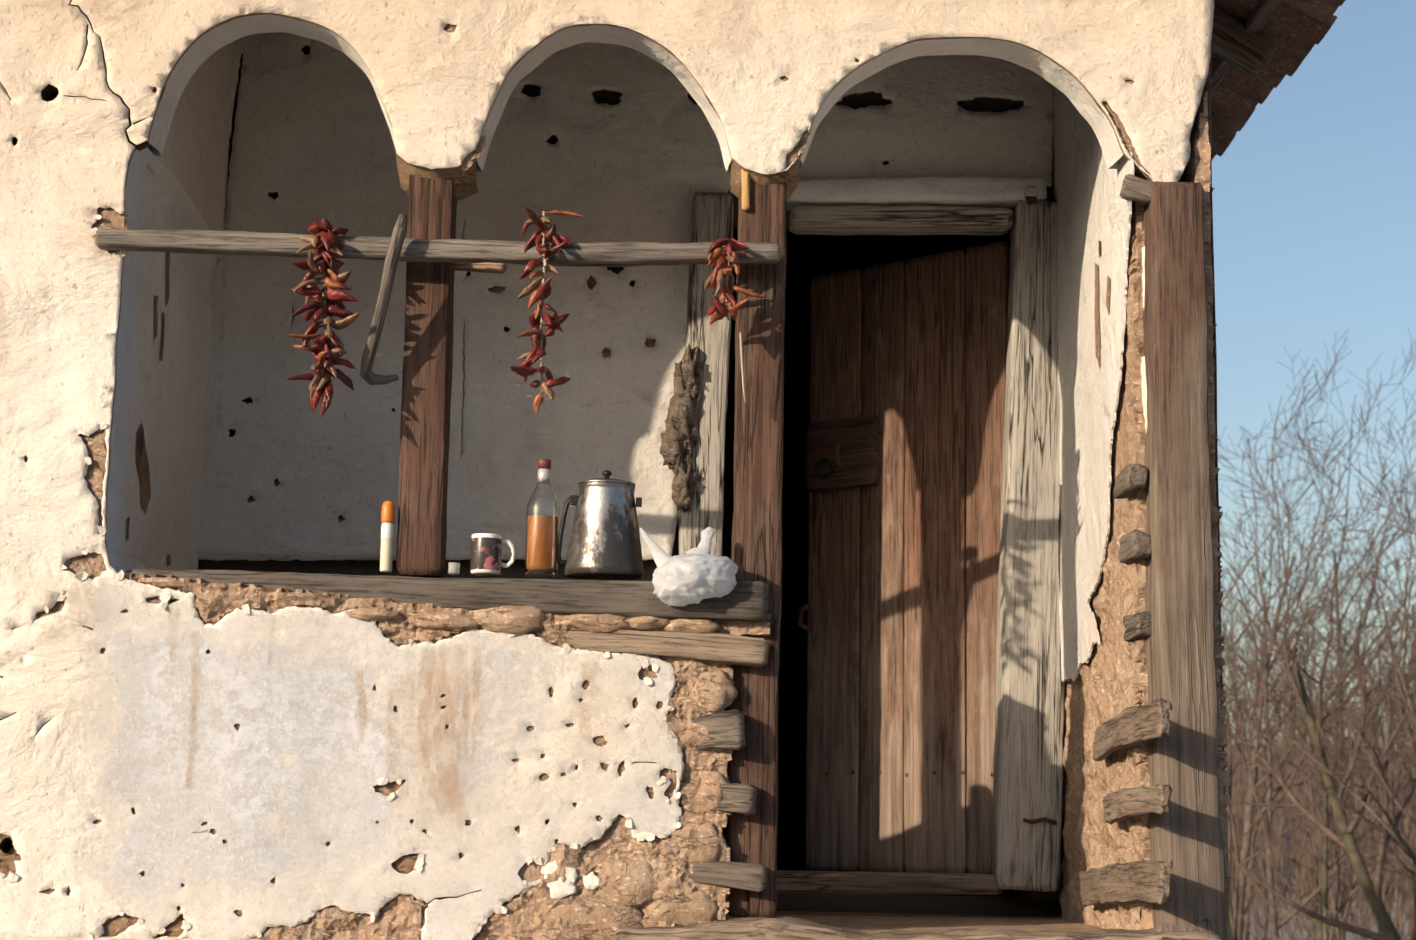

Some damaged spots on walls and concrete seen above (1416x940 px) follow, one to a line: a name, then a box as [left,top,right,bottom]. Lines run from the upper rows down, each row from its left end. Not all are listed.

crack [64,0,150,152]
flaking render [1140,356,1148,436]
flaking render [79,423,111,536]
flaking render [62,551,125,581]
flaking render [625,657,659,728]
flaking render [593,736,626,777]
flaking render [374,777,406,801]
flaking render [645,768,681,803]
flaking render [0,834,21,882]
flaking render [392,852,424,874]
flaking render [518,839,600,899]
flaking render [84,906,191,940]